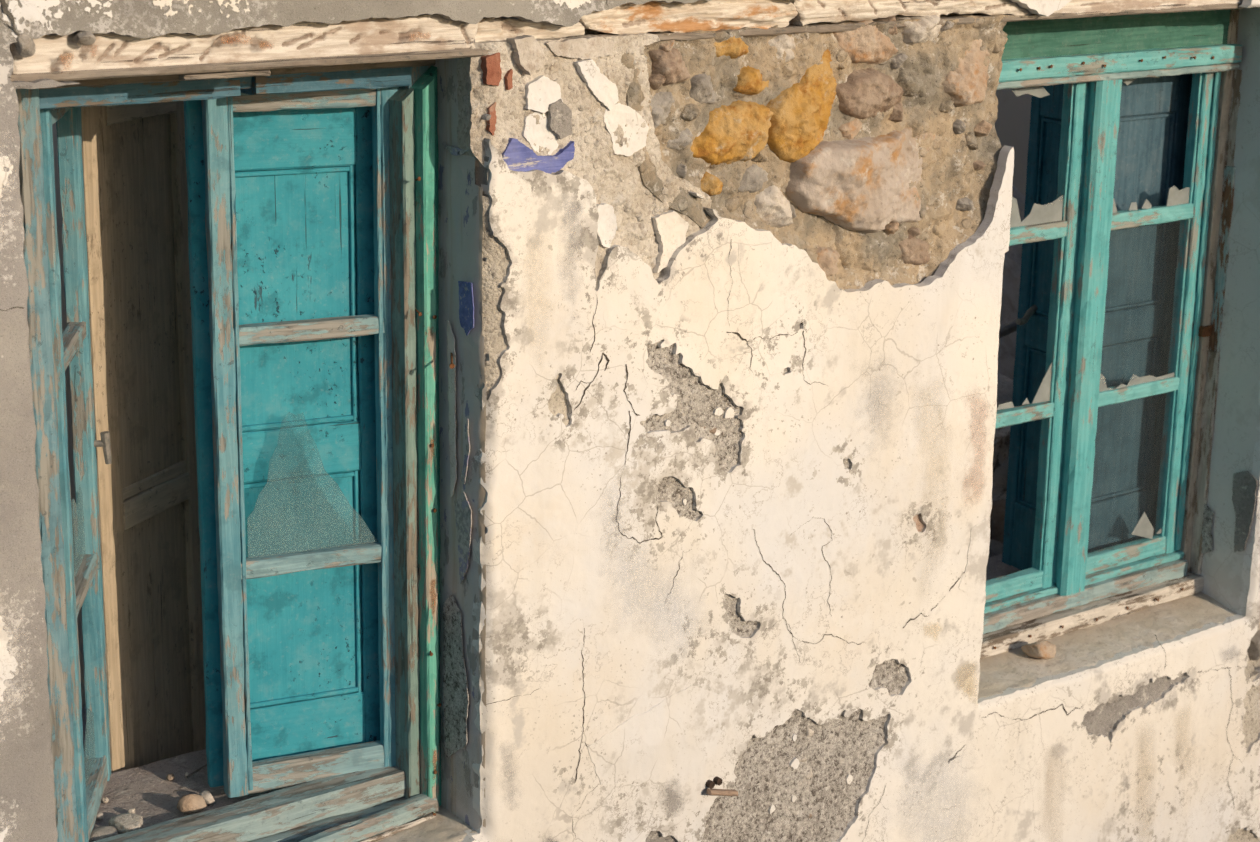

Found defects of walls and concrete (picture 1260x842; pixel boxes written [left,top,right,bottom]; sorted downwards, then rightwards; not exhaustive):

crack [0,0,20,36]
peeling [0,0,113,58]
flaking render [456,13,1037,290]
crack [726,238,825,385]
crack [570,287,683,603]
flaking render [658,476,701,520]
flaking render [640,341,743,472]
crack [753,518,865,663]
crack [903,572,964,628]
flaking render [869,659,909,695]
flaking render [1082,673,1187,739]
flaking render [701,709,888,842]